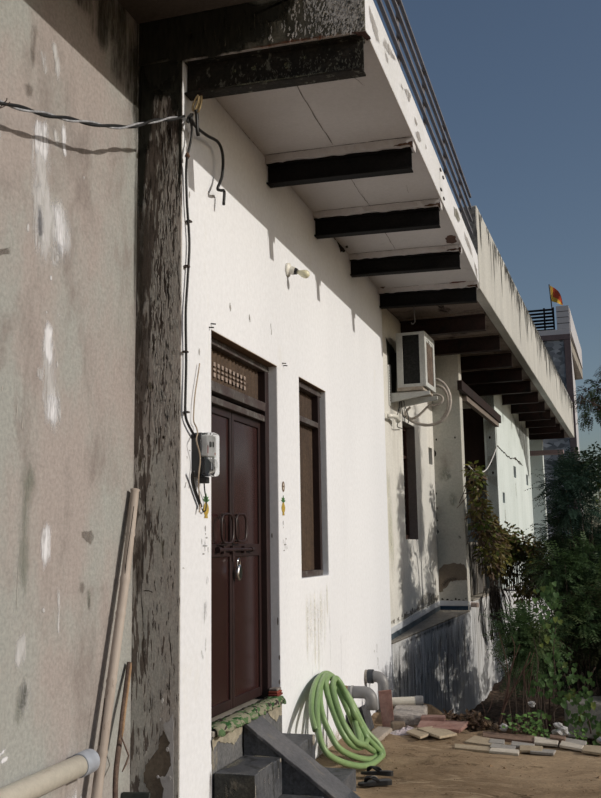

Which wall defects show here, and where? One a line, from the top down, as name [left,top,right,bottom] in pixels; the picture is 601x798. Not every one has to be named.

peeling [268,0,395,62]
water stain [98,0,294,305]
crack [244,86,405,155]
water stain [135,322,151,416]
water stain [135,539,143,593]
spalling [439,563,467,601]
water stain [394,611,504,706]
spalling [136,731,171,798]